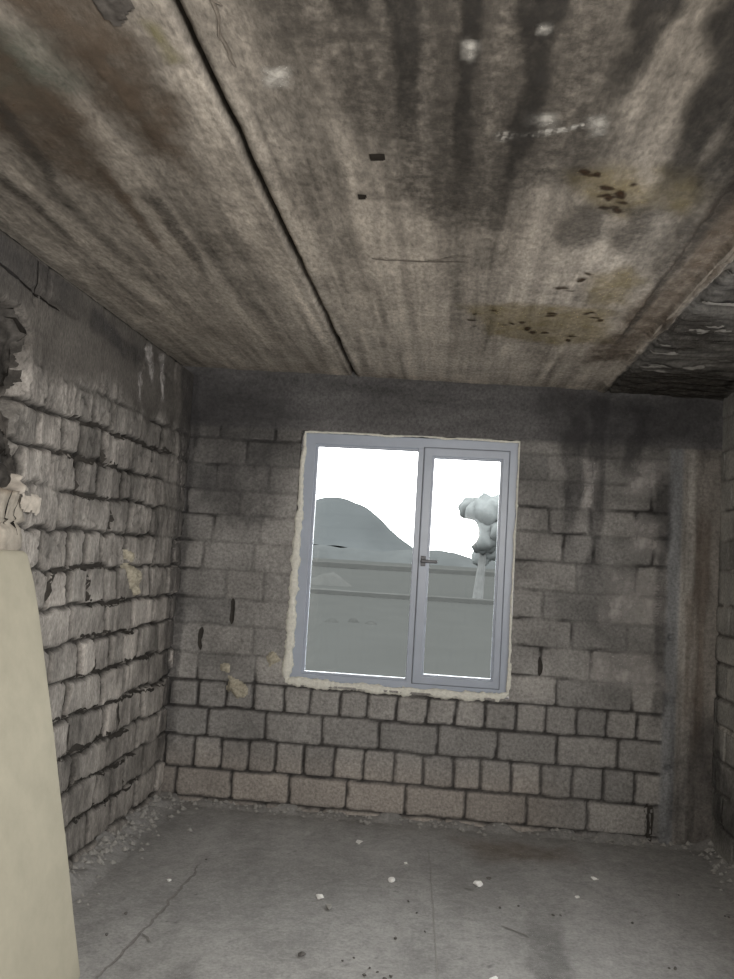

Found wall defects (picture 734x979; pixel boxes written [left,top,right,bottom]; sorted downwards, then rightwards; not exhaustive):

water stain [261,0,620,222]
water stain [592,0,734,360]
spalling [0,302,27,397]
peeling [0,411,41,551]
water stain [583,464,596,507]